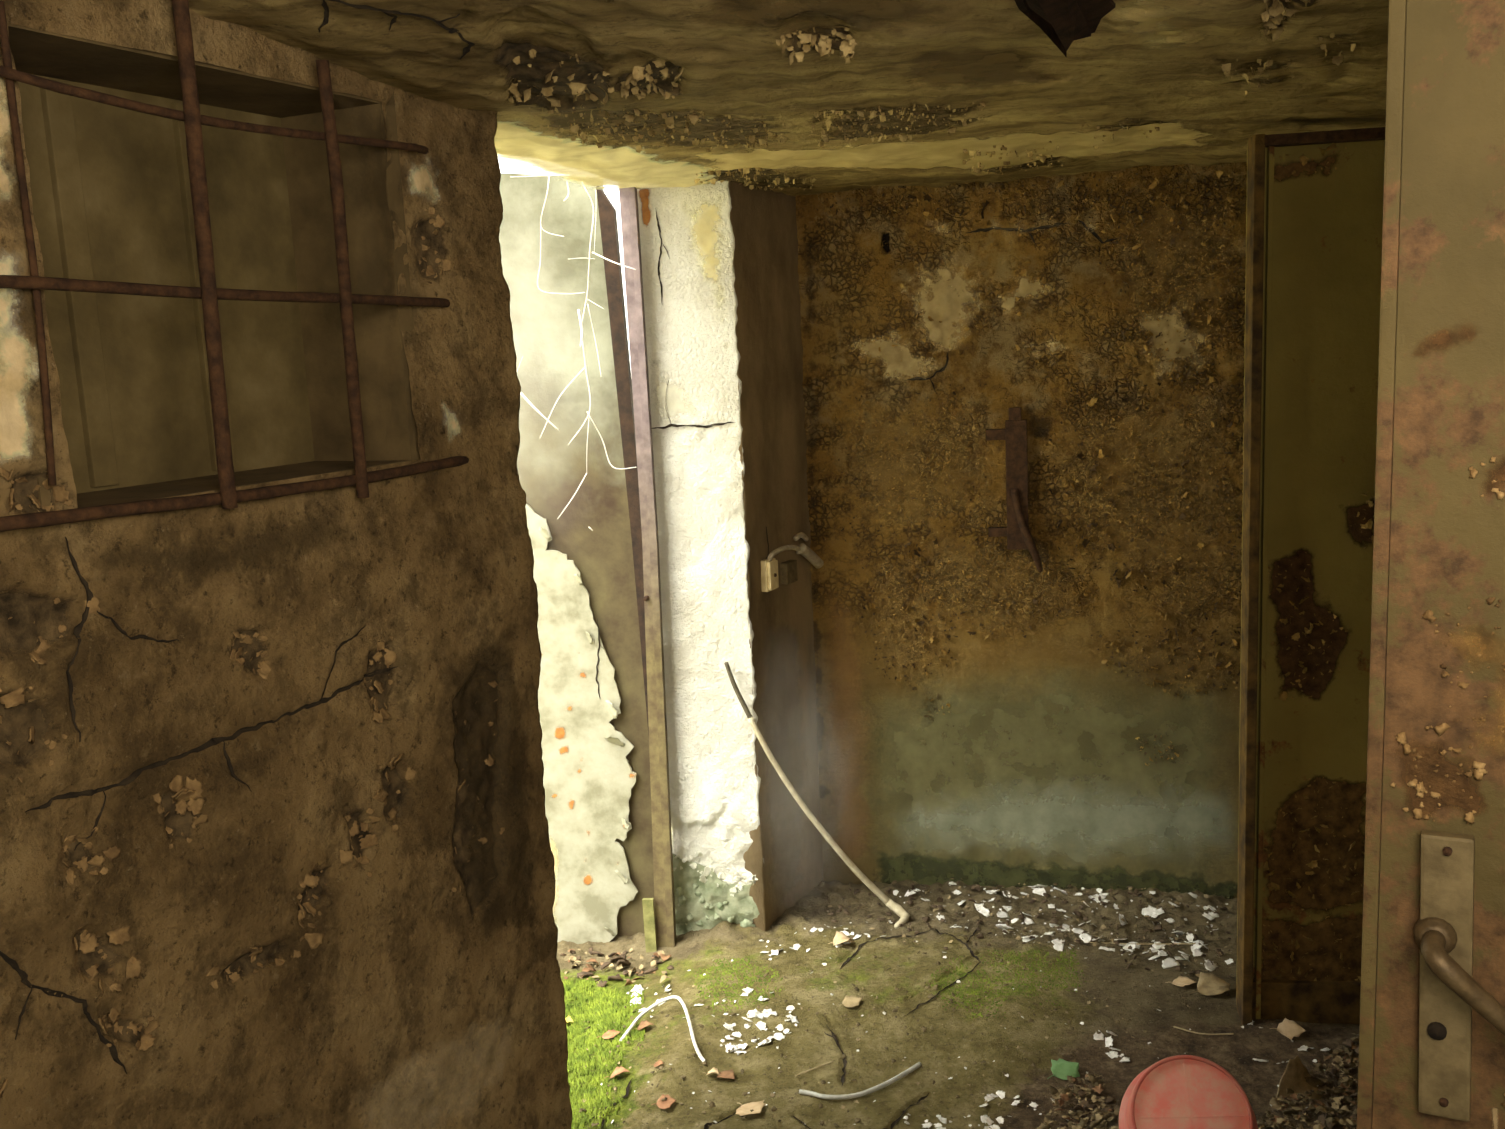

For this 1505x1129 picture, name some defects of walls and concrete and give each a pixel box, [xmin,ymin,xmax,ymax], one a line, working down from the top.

crack [318,0,475,59]
spalling [776,27,858,65]
spalling [494,42,792,153]
peeling [807,102,986,147]
crack [652,380,736,429]
crack [65,537,179,742]
crack [25,625,396,851]
water stain [915,794,1225,844]
crack [0,951,127,1074]